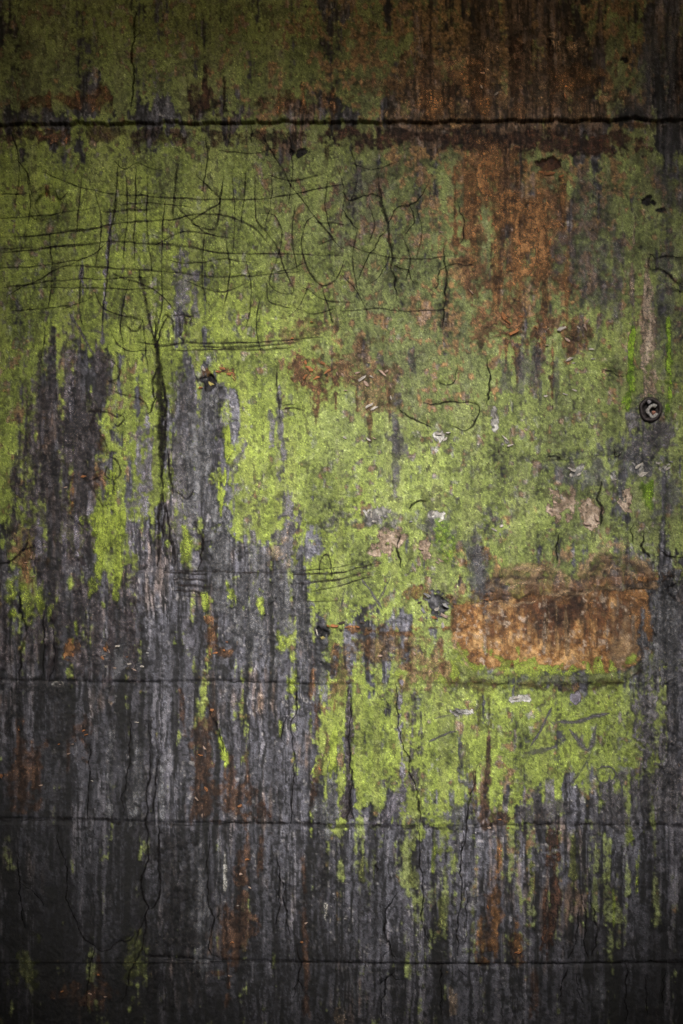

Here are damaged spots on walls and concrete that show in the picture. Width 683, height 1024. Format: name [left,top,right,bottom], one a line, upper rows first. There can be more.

rust [186,57,653,409]
spalling [196,366,235,392]
spalling [63,638,81,663]
spalling [89,638,149,676]
rust [331,576,667,831]